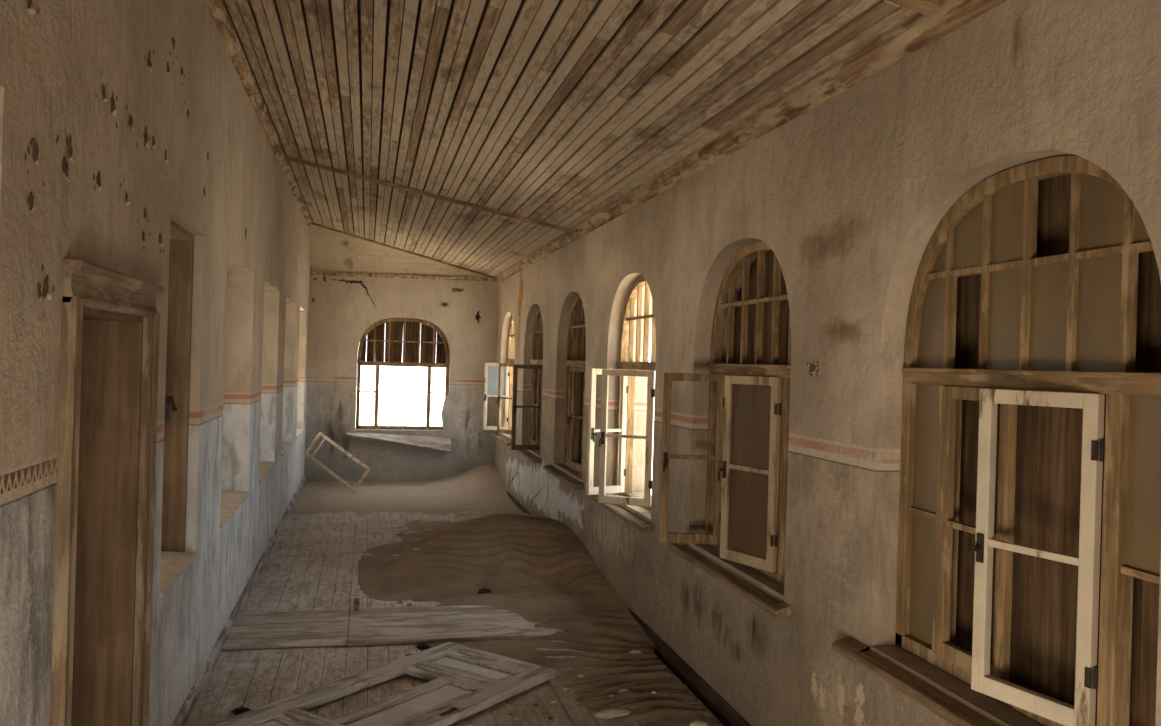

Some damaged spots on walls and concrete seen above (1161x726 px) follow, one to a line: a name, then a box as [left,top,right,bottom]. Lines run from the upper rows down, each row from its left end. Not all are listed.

flaking render [96,71,169,174]
flaking render [25,138,39,174]
flaking render [56,134,75,182]
flaking render [37,263,55,318]
crack [330,279,376,308]
peeling [498,450,593,538]